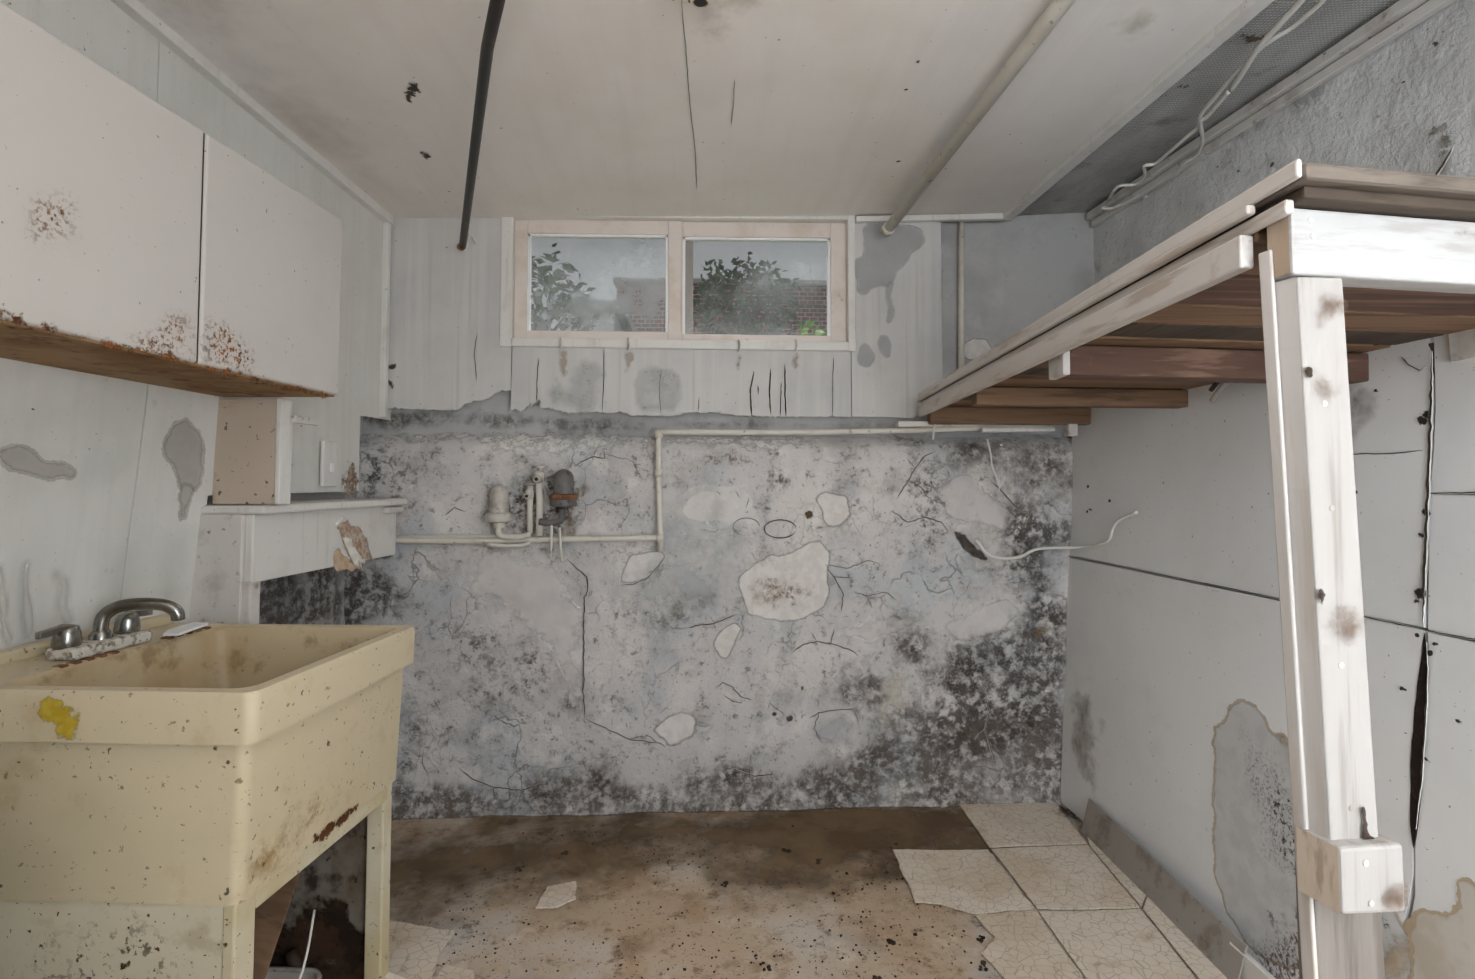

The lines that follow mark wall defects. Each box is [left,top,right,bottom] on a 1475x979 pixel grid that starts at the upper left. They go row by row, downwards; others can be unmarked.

peeling [341,463,359,496]
peeling [334,516,373,571]
damp [360,414,648,498]
damp [505,476,570,533]
crack [716,490,796,539]
flaking render [817,492,850,526]
crack [893,452,949,533]
damp [259,556,400,625]
flaking render [714,542,829,658]
crack [794,560,895,653]
crack [567,557,666,748]
damp [390,504,1083,919]